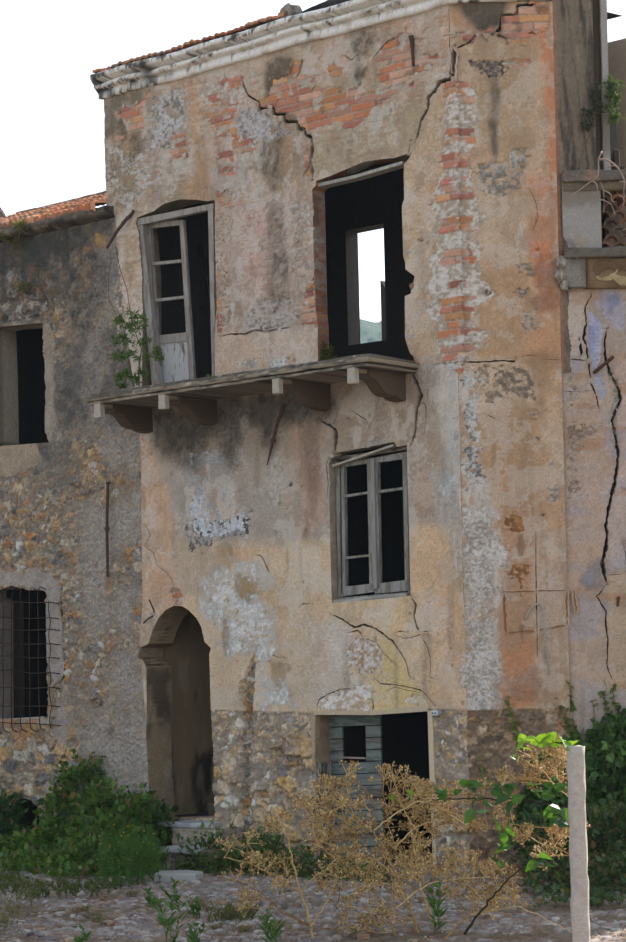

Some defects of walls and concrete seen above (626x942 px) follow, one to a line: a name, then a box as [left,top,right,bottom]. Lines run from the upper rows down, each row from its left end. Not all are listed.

crack [241,78,315,179]
crack [340,33,395,61]
crack [407,2,535,155]
peeling [468,58,508,78]
spalling [462,1,549,46]
spalling [105,33,438,338]
spalling [406,80,546,491]
peeling [185,446,253,552]
crack [317,408,371,499]
crack [410,291,626,690]
peeling [318,636,385,711]
crack [299,596,438,711]